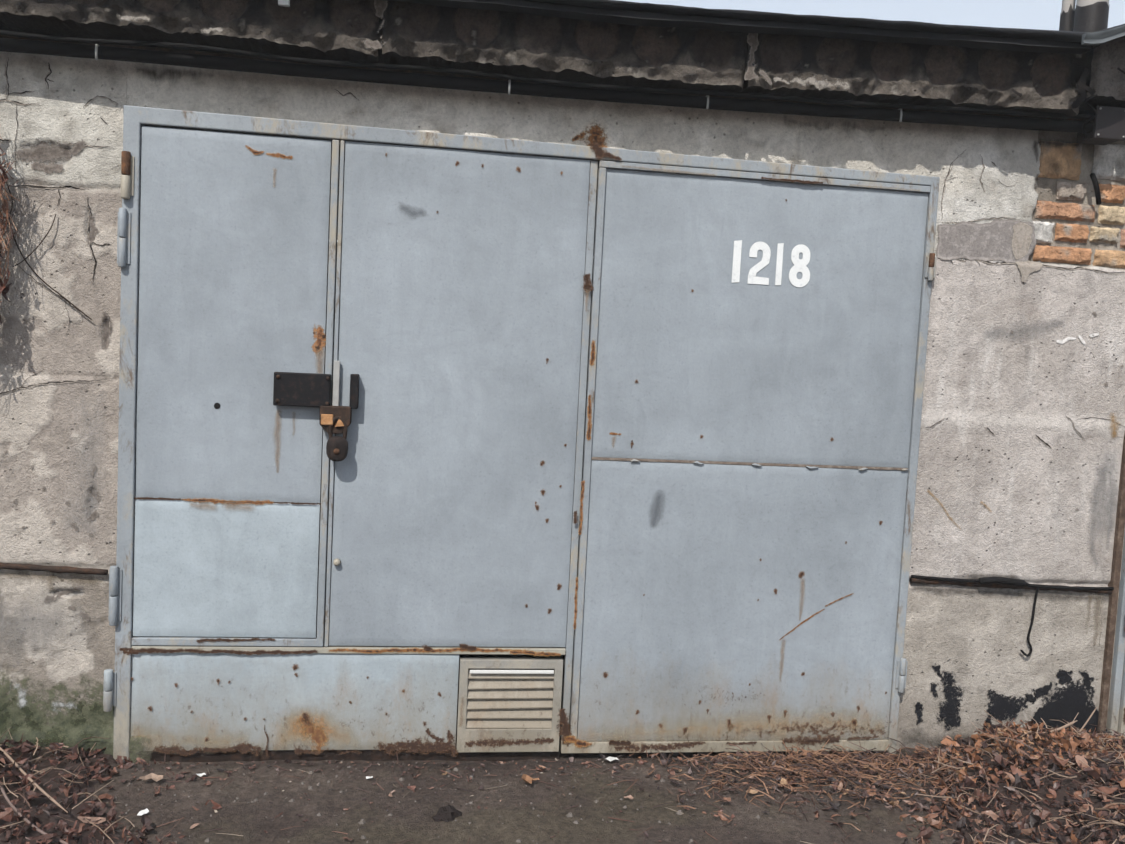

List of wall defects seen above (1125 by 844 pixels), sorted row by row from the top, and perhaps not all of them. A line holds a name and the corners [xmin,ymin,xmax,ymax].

crack [0,57,107,285]
crack [69,95,118,148]
rust [245,145,293,159]
rust [572,124,622,161]
spalling [1033,140,1125,268]
crack [13,261,90,335]
rust [312,325,326,365]
crack [0,369,107,395]
rust [119,638,560,677]
rust [290,712,360,755]
rust [373,709,592,757]
rust [607,706,888,753]